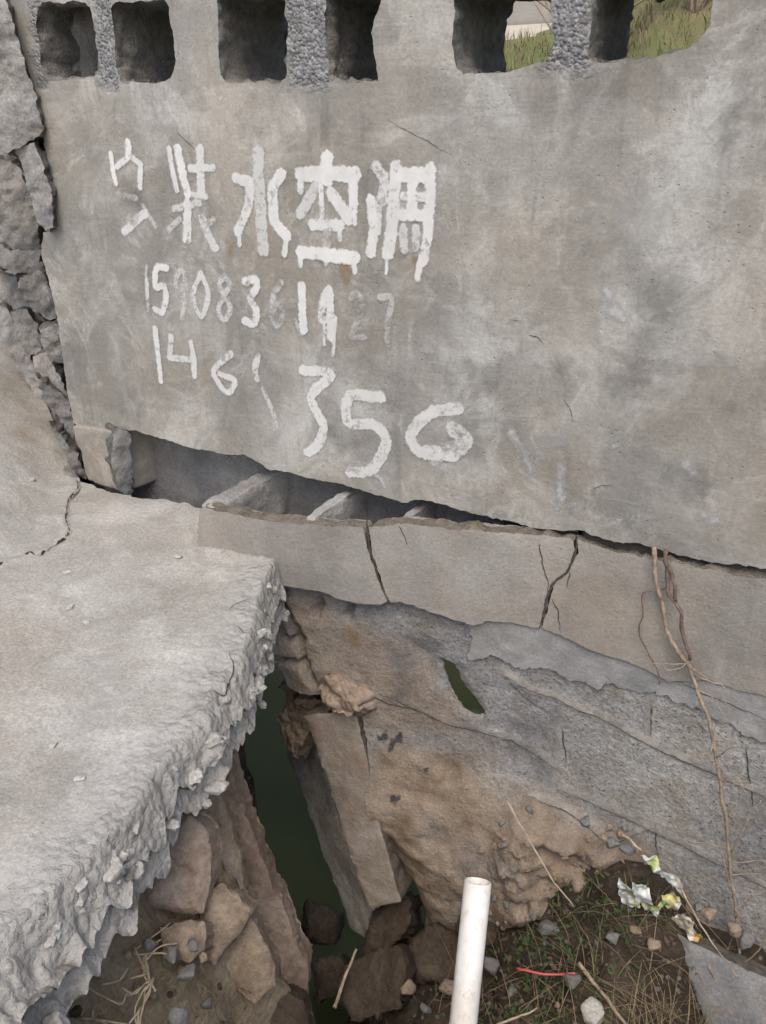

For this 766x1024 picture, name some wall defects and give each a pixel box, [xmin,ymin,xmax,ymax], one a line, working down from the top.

crack [0,481,80,565]
crack [365,513,388,601]
crack [538,531,766,629]